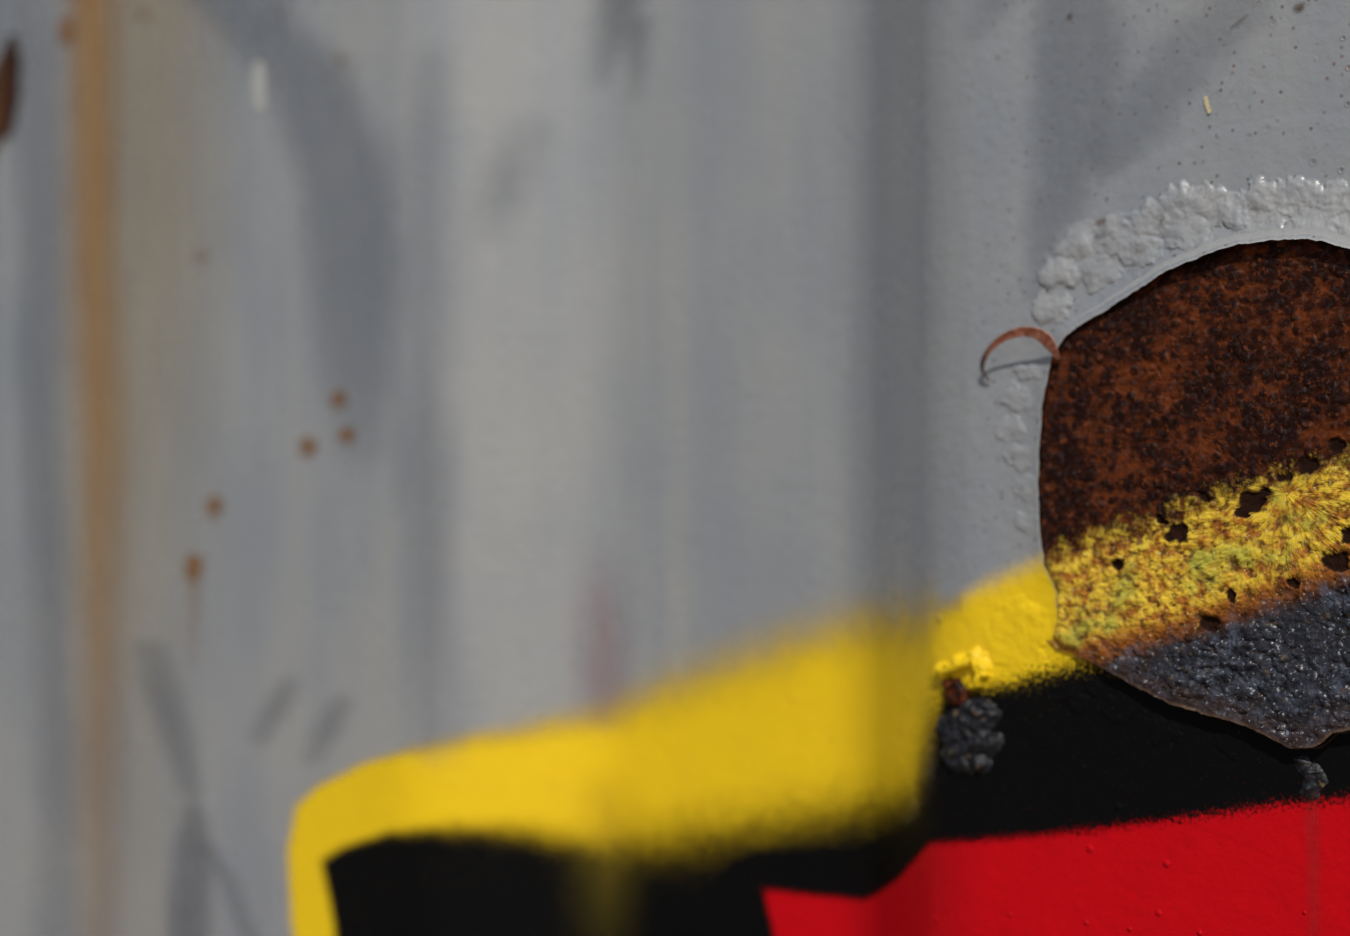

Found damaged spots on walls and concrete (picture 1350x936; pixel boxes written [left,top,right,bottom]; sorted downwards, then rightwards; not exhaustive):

peeling [933,113,1350,870]